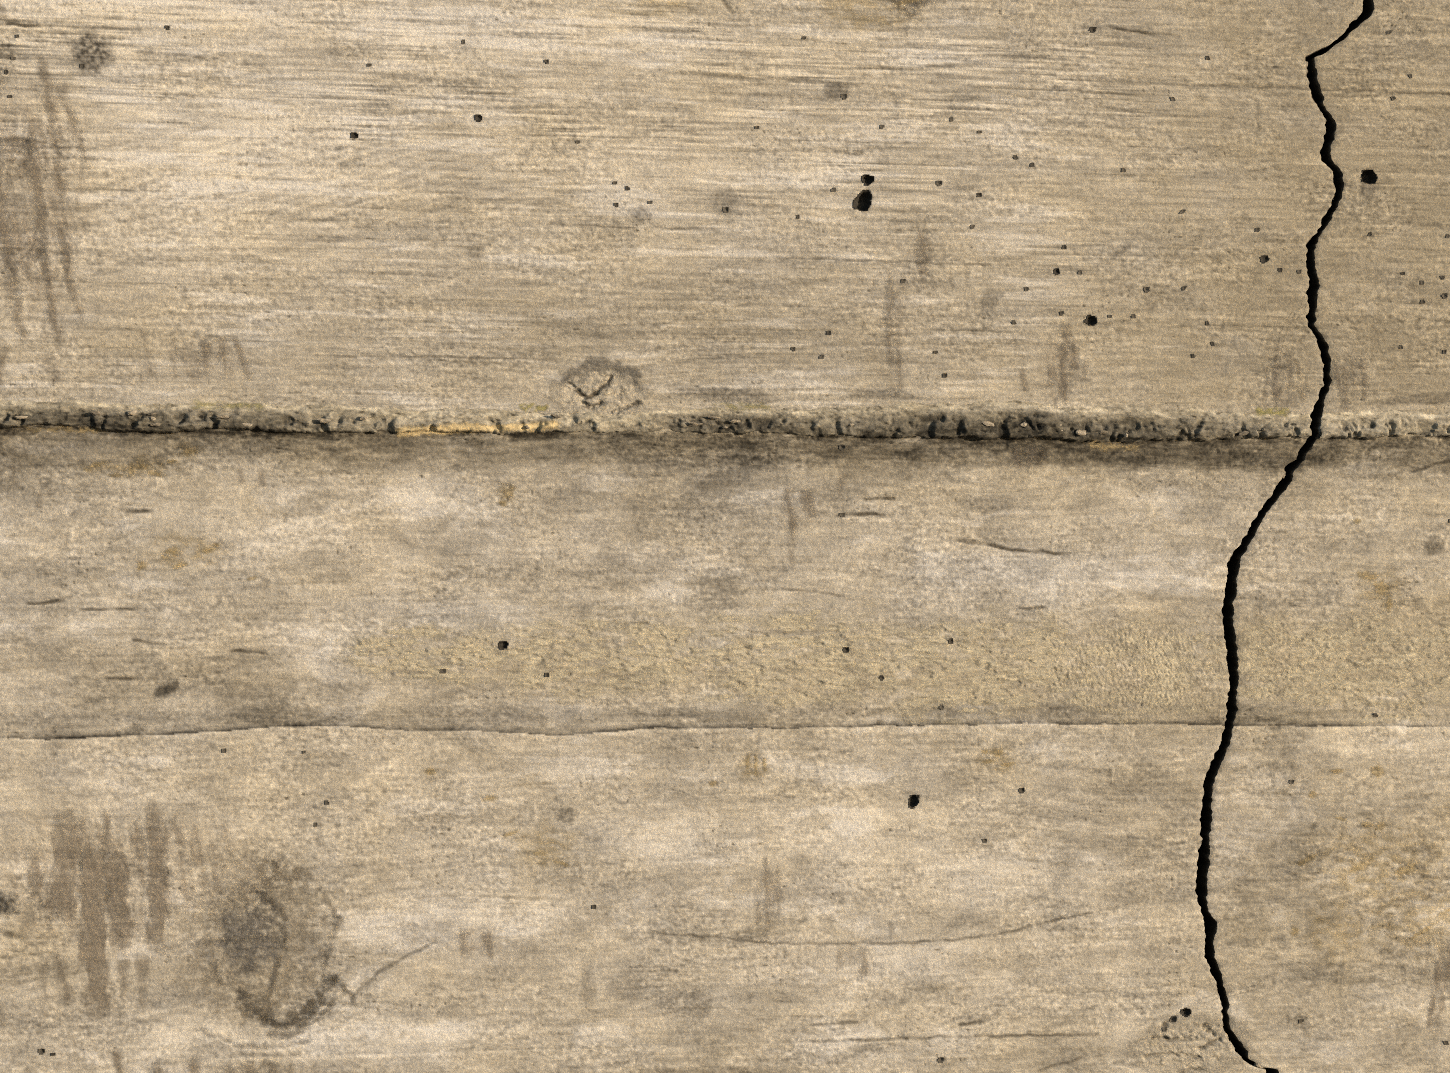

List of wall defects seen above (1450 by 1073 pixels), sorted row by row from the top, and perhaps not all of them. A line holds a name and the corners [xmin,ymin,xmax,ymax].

crack [1195,0,1375,1073]